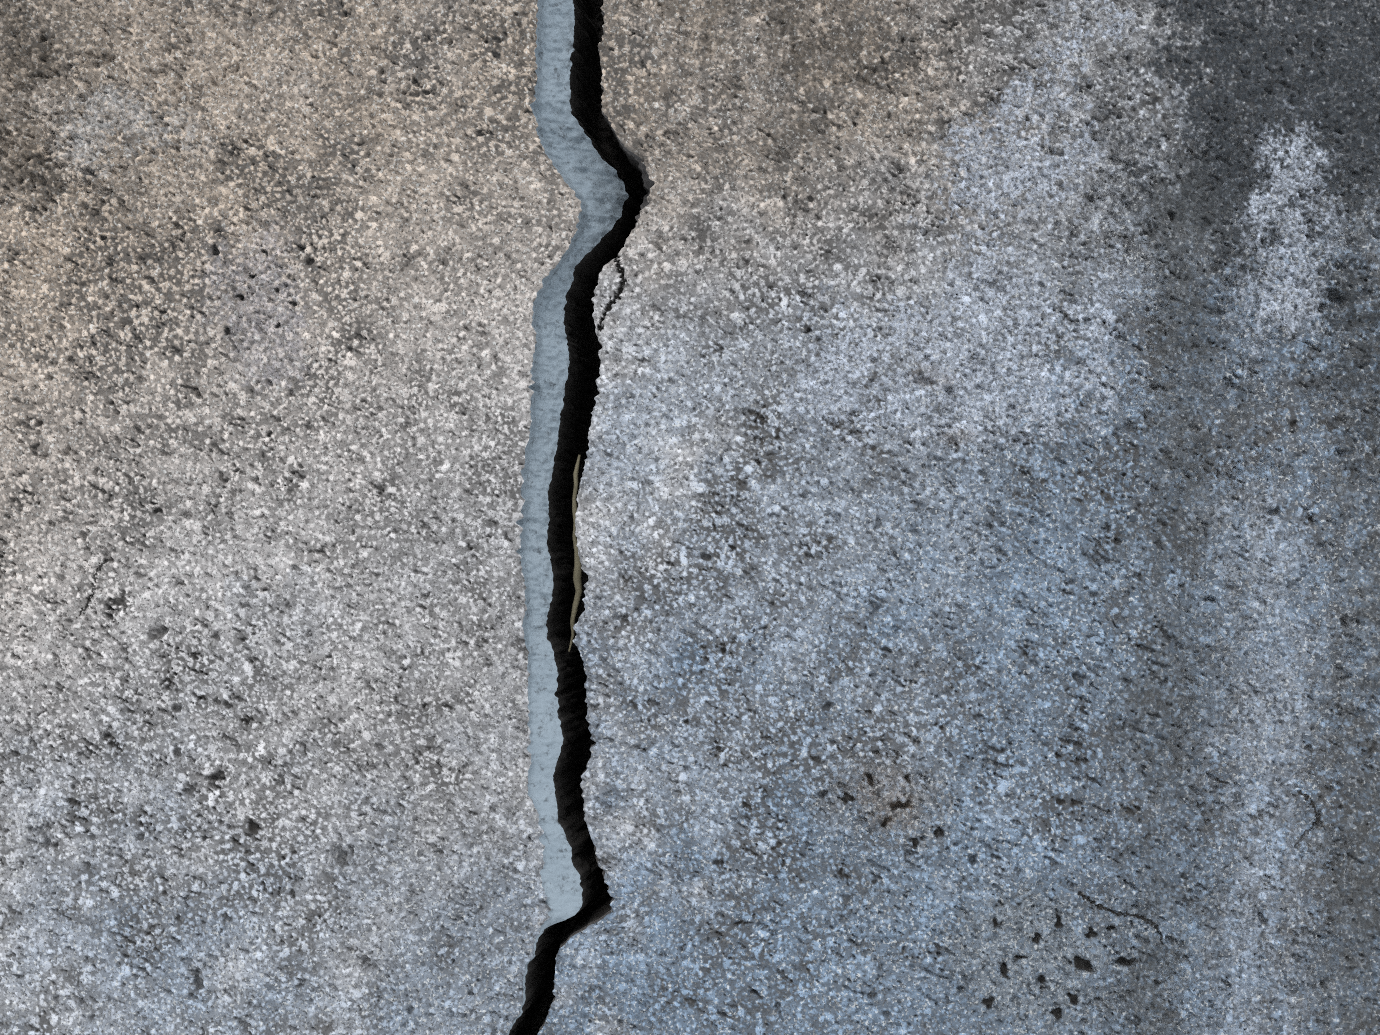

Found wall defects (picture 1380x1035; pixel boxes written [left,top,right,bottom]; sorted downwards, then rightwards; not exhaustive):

crack [507,0,655,1035]